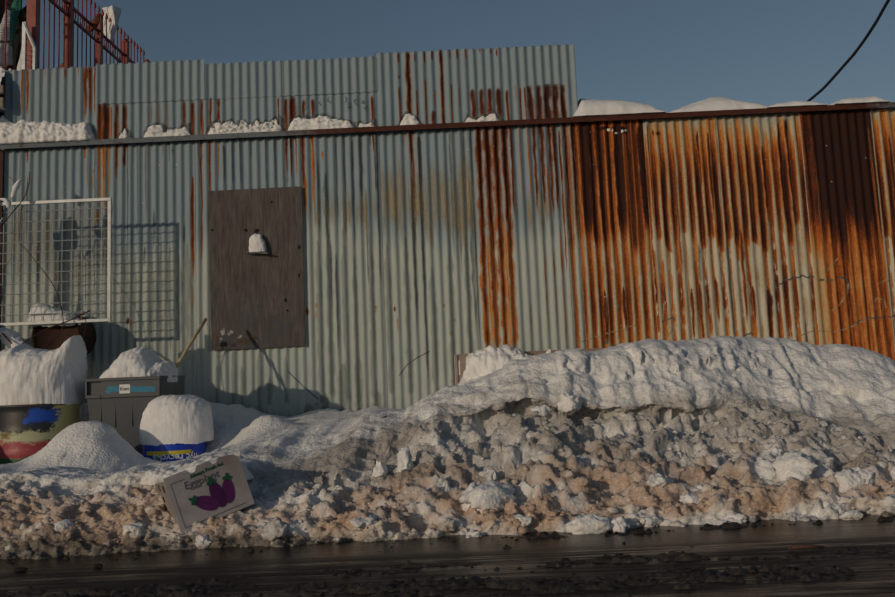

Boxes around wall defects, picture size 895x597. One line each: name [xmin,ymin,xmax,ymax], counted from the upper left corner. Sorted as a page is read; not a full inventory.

rust [14,70,29,111]
rust [78,67,127,222]
rust [182,98,220,272]
rust [277,97,323,220]
rust [397,50,466,124]
rust [372,84,895,360]